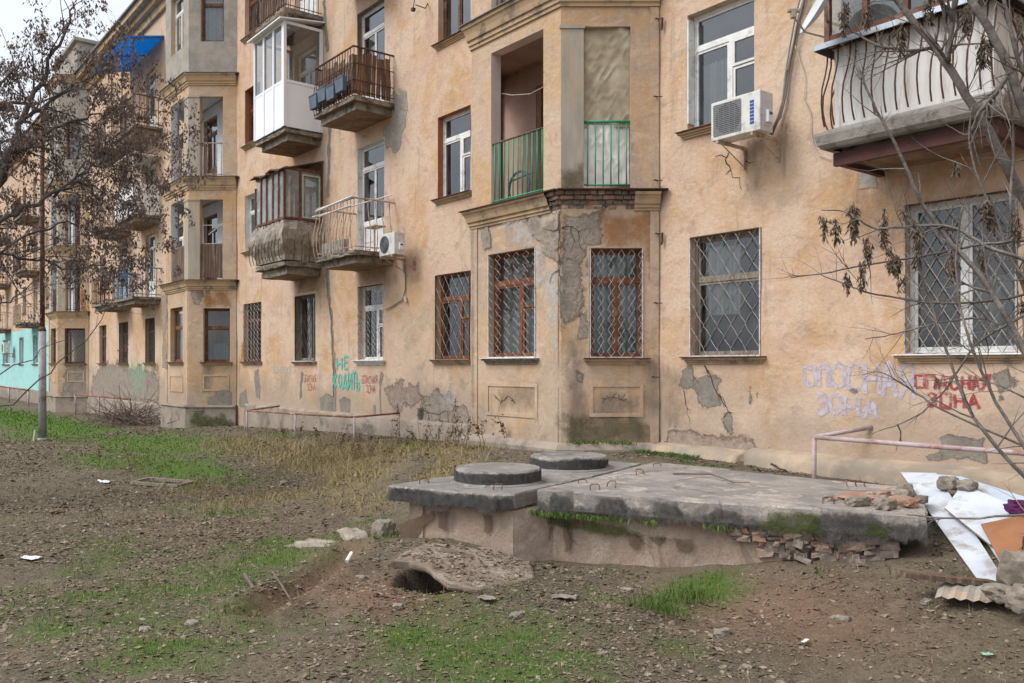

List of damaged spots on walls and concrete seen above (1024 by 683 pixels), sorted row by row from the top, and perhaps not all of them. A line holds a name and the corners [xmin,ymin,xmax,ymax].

peeling [507,205,605,340]
peeling [384,379,471,424]
spalling [666,365,756,450]
crack [704,365,732,432]
spalling [993,369,1019,400]